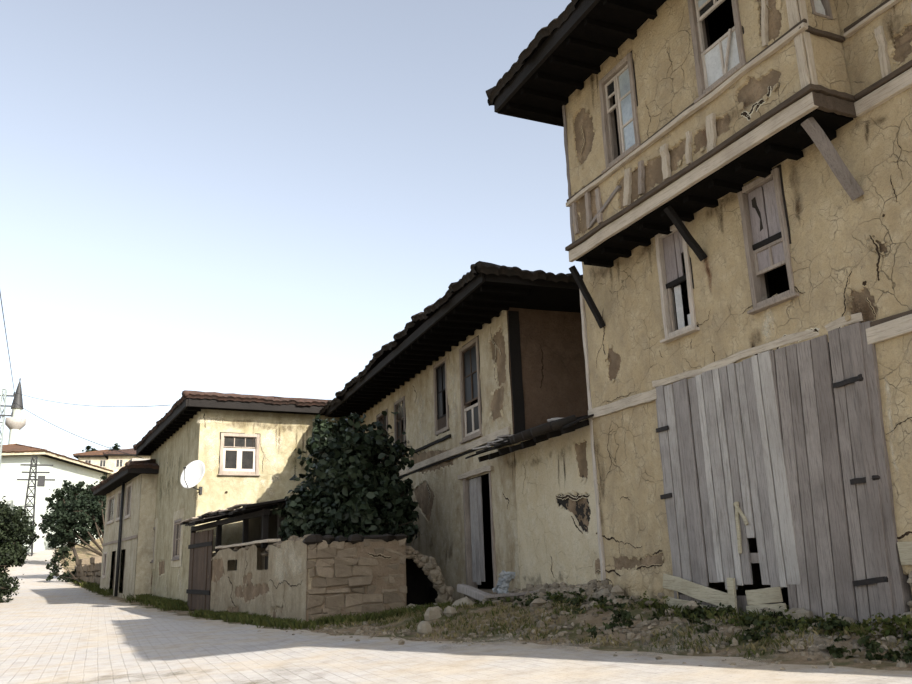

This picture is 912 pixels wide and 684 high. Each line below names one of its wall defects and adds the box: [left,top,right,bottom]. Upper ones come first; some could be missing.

flaking render [619,70,781,209]
crack [890,134,912,202]
crack [841,234,882,327]
flaking render [845,287,877,325]
flaking render [489,327,506,422]
flaking render [604,344,621,382]
crack [886,416,912,436]
flaking render [572,439,588,483]
crack [897,530,912,541]